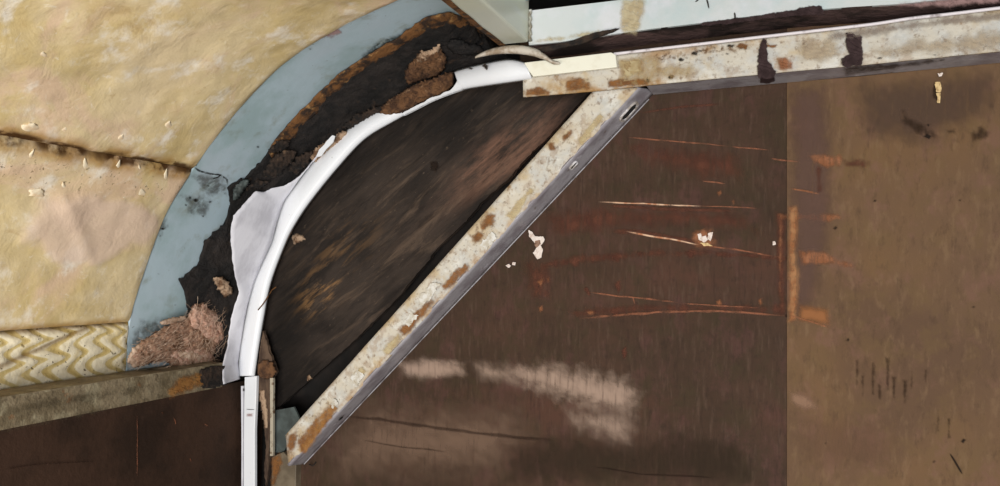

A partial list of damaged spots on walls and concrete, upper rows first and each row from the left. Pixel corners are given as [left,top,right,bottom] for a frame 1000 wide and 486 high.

rust [472,215,495,242]
peeling [480,232,497,249]
peeling [528,230,545,259]
peeling [693,230,713,246]
rust [442,265,468,290]
rust [745,208,847,323]
peeling [405,283,441,327]
rust [384,300,433,354]
water stain [404,360,463,378]
water stain [480,367,634,409]
water stain [576,418,625,437]
rust [272,405,337,484]